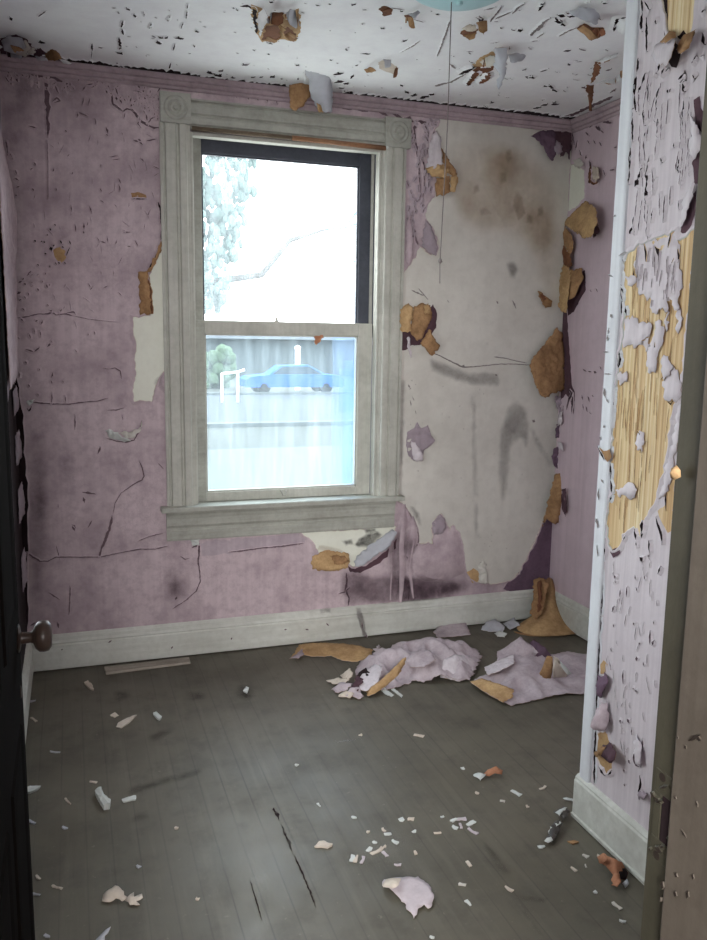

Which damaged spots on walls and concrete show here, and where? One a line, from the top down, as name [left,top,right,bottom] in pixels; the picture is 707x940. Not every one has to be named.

peeling [0,34,72,64]
peeling [89,3,207,69]
peeling [223,0,333,55]
peeling [329,52,445,102]
peeling [350,2,441,48]
peeling [456,0,626,118]
flaking render [133,248,164,402]
flaking render [340,108,620,584]
peeling [581,0,703,800]
crack [15,377,202,632]
flaking render [303,526,396,566]
crack [272,808,317,908]